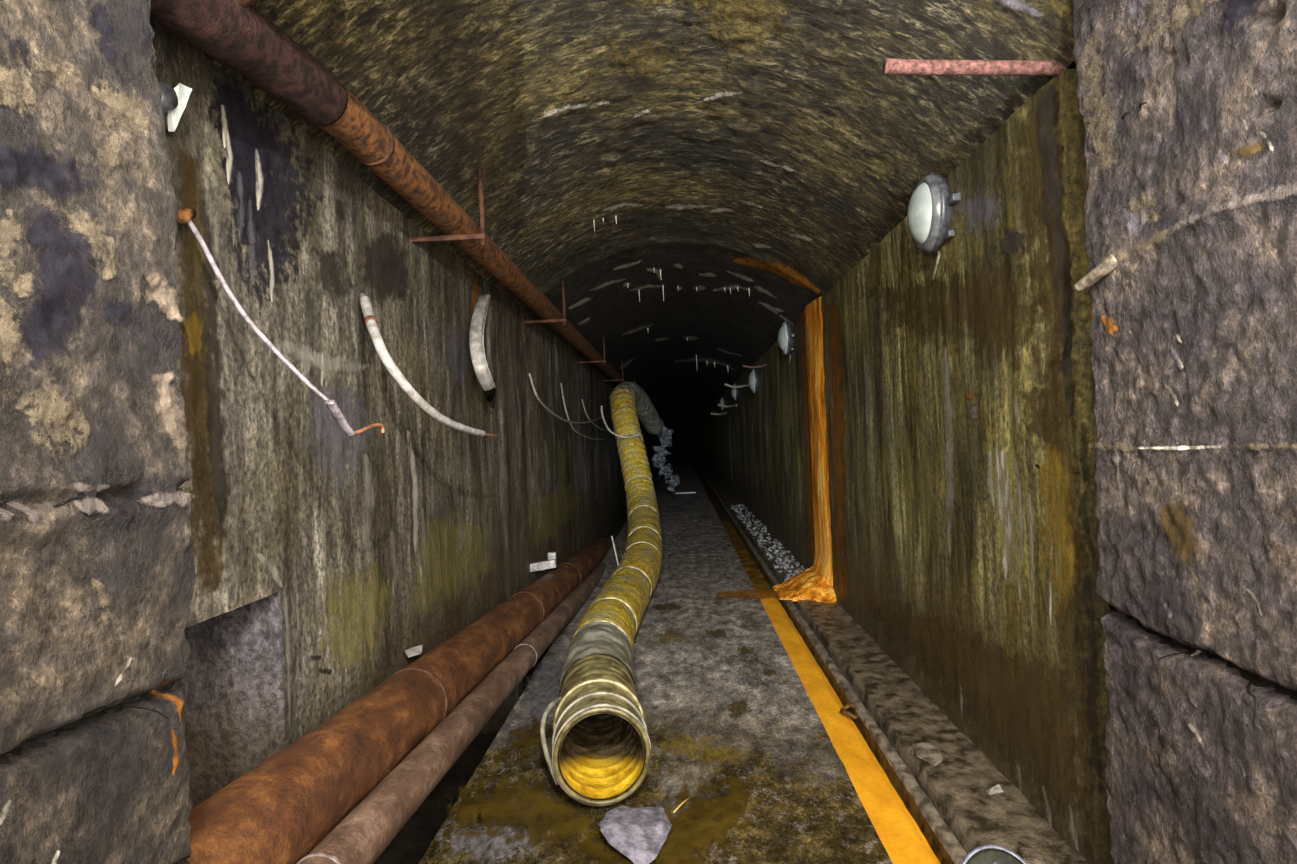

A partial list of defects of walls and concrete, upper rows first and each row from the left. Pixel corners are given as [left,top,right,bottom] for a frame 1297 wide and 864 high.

water stain [320,453,398,664]
water stain [407,431,491,609]
water stain [498,387,522,510]
corrosion [717,257,847,603]
water stain [863,85,1297,852]
crack [1109,605,1297,700]